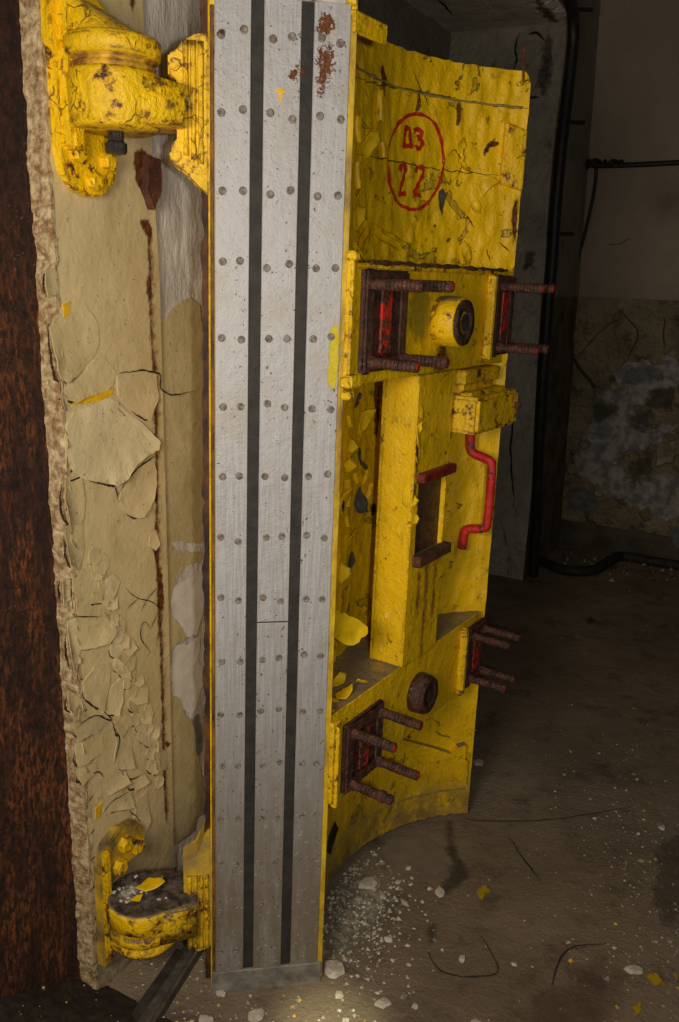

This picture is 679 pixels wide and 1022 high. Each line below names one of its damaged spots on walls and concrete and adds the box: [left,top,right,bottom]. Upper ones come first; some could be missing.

corrosion [133,149,162,379]
crack [111,434,155,499]
crack [119,369,195,396]
peeling [566,349,679,522]
crack [73,588,163,650]
peeling [47,298,206,957]
corrosion [153,547,170,750]